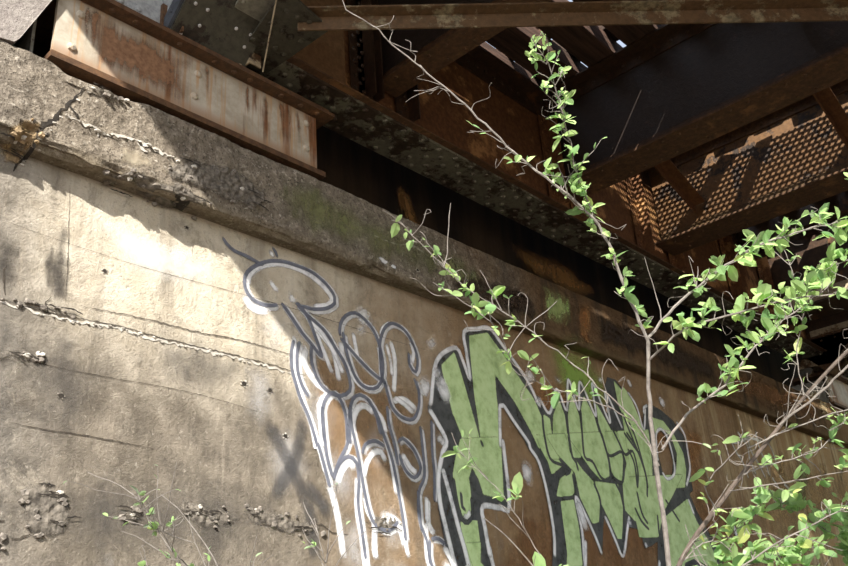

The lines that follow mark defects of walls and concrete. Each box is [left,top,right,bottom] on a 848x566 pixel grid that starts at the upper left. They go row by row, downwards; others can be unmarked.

rust [85,8,188,95]
spalling [0,118,45,163]
crack [13,86,181,171]
crack [3,201,432,376]
water stain [293,191,535,319]
rust [523,254,586,291]
water stain [547,297,569,318]
crack [10,355,258,412]
spalling [18,481,81,539]